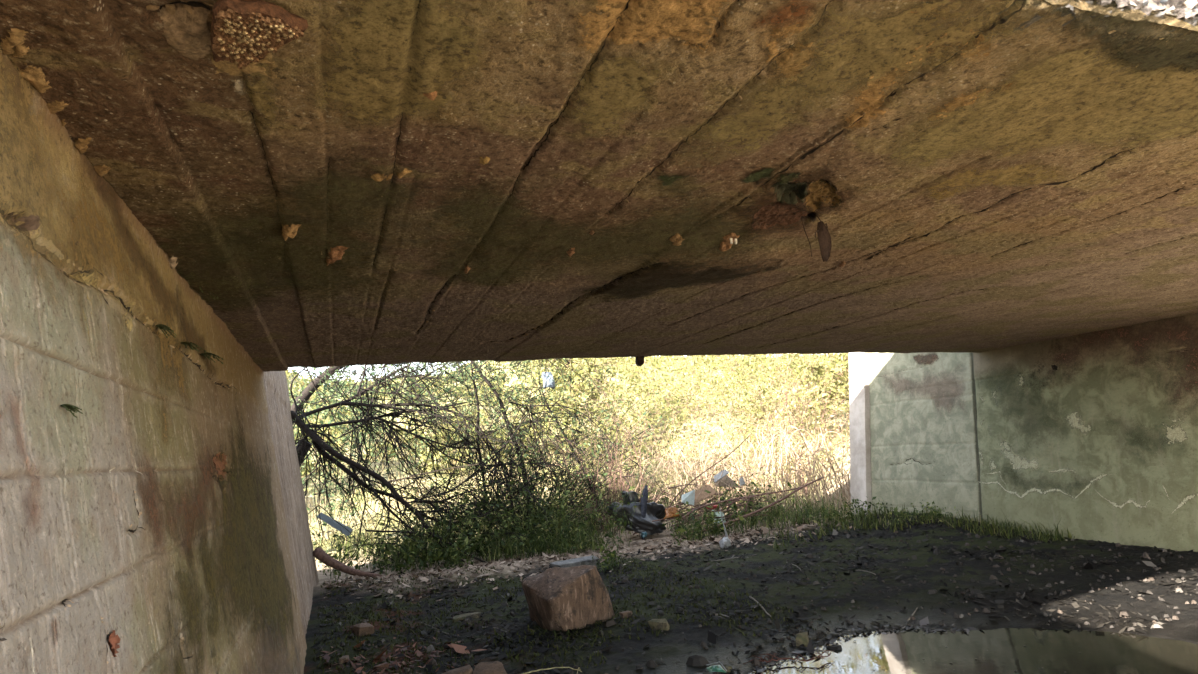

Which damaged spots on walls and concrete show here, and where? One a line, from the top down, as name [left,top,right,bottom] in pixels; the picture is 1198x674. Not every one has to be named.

spalling [1120,0,1198,19]
crack [503,0,630,207]
crack [604,0,848,214]
spalling [2,212,40,233]
crack [417,245,479,332]
crack [490,263,656,342]
water stain [578,260,781,302]
crack [666,145,1141,348]